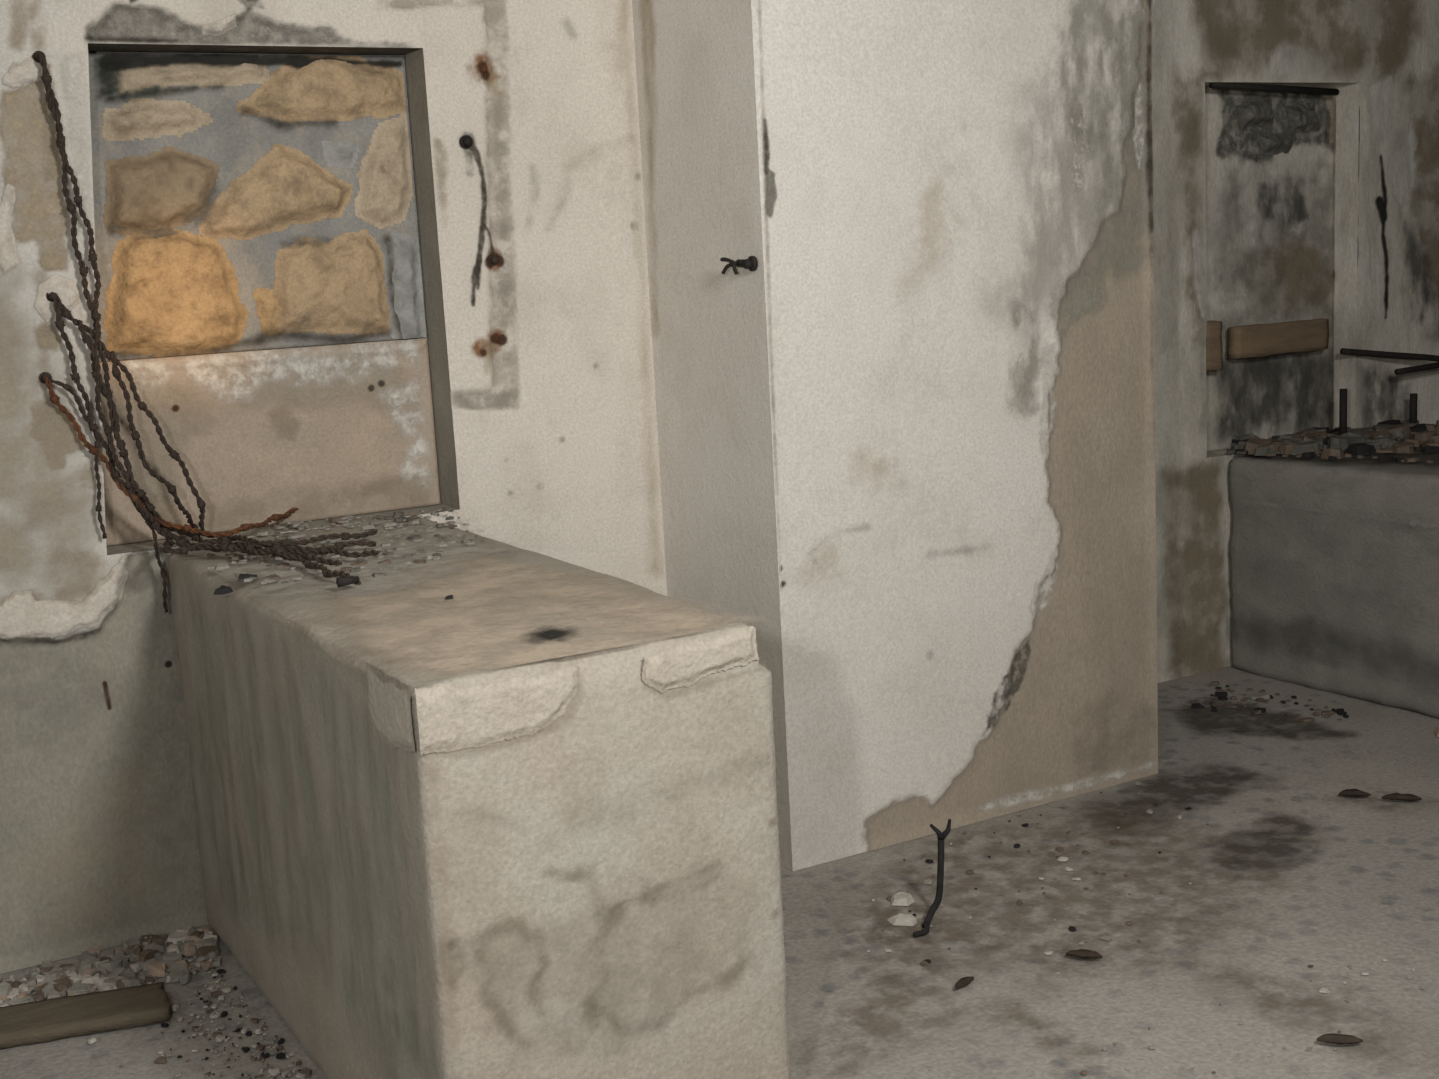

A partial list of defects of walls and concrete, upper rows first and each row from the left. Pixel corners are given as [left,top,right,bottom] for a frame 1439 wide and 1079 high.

rust [476,55,496,81]
water stain [1198,0,1439,319]
rust [486,251,504,270]
rust [473,331,507,356]
water stain [865,0,1225,852]
water stain [1365,371,1401,427]
spalling [528,627,571,642]
spalling [642,626,759,693]
spalling [366,662,580,755]
spalling [0,550,209,974]